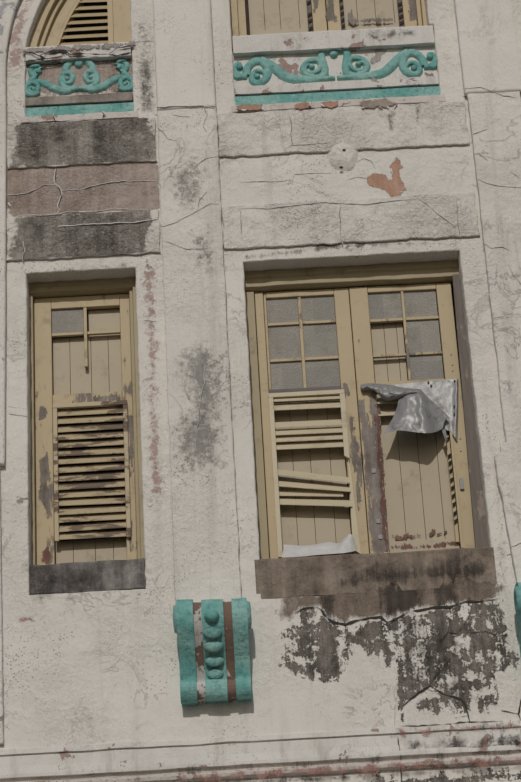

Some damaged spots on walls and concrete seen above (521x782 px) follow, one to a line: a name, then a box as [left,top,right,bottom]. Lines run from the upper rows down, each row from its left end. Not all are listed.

peeling [313,0,338,22]
peeling [408,0,417,21]
peeling [370,49,386,65]
spalling [29,59,133,93]
peeling [294,100,338,109]
peeling [359,98,397,109]
damp [9,118,156,167]
peeling [367,158,407,197]
crack [7,167,218,250]
crack [240,198,461,244]
spalling [279,598,520,722]
peeling [366,767,521,782]